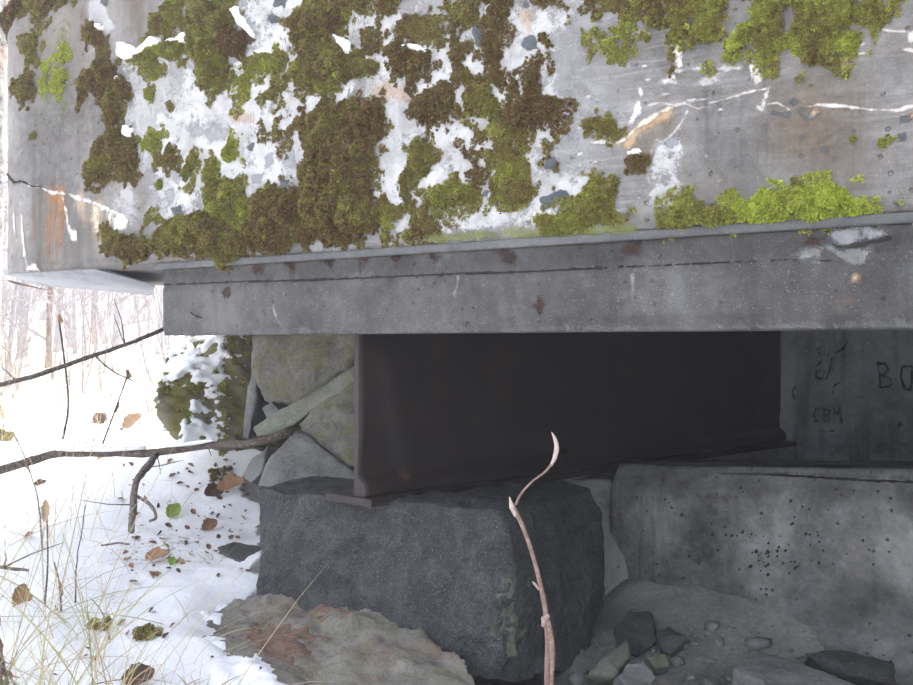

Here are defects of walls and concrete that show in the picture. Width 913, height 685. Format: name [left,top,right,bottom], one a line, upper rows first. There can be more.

crack [858,28,913,55]
crack [591,88,913,182]
crack [6,173,41,187]